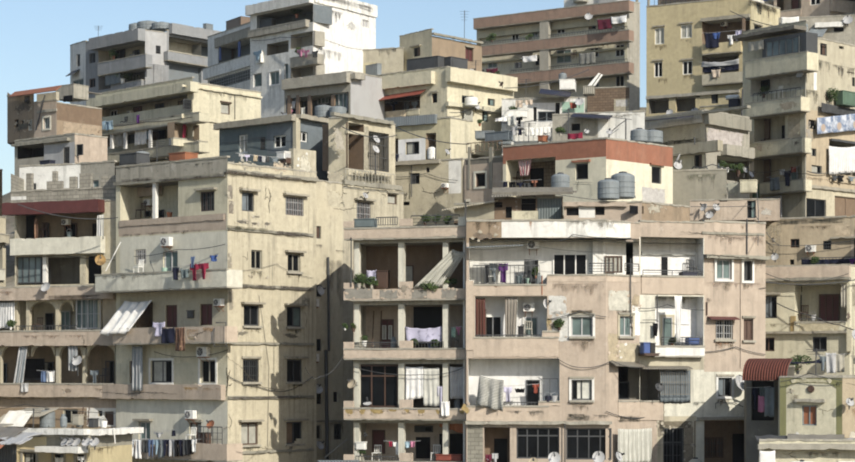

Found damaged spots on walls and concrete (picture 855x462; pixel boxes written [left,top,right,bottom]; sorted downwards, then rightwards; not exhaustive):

peeling [548,296,569,342]
peeling [608,290,642,362]